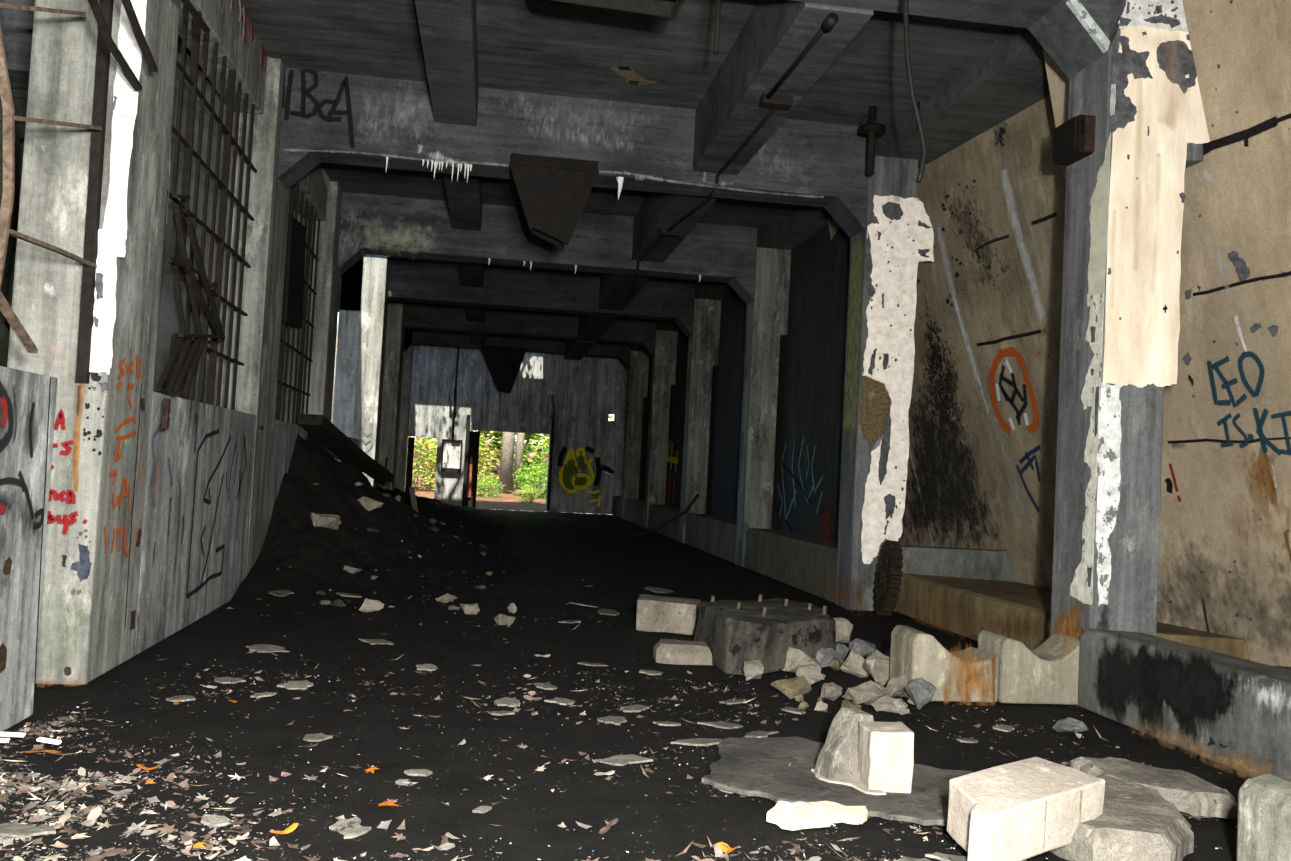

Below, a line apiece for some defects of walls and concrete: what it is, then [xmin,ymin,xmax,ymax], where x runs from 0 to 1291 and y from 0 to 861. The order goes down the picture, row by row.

peeling [1110,0,1197,136]
peeling [866,202,932,332]
peeling [1227,251,1250,281]
leakage [902,123,1045,547]
peeling [1178,346,1195,398]
spalling [860,348,911,536]
corrosion [1251,451,1277,506]